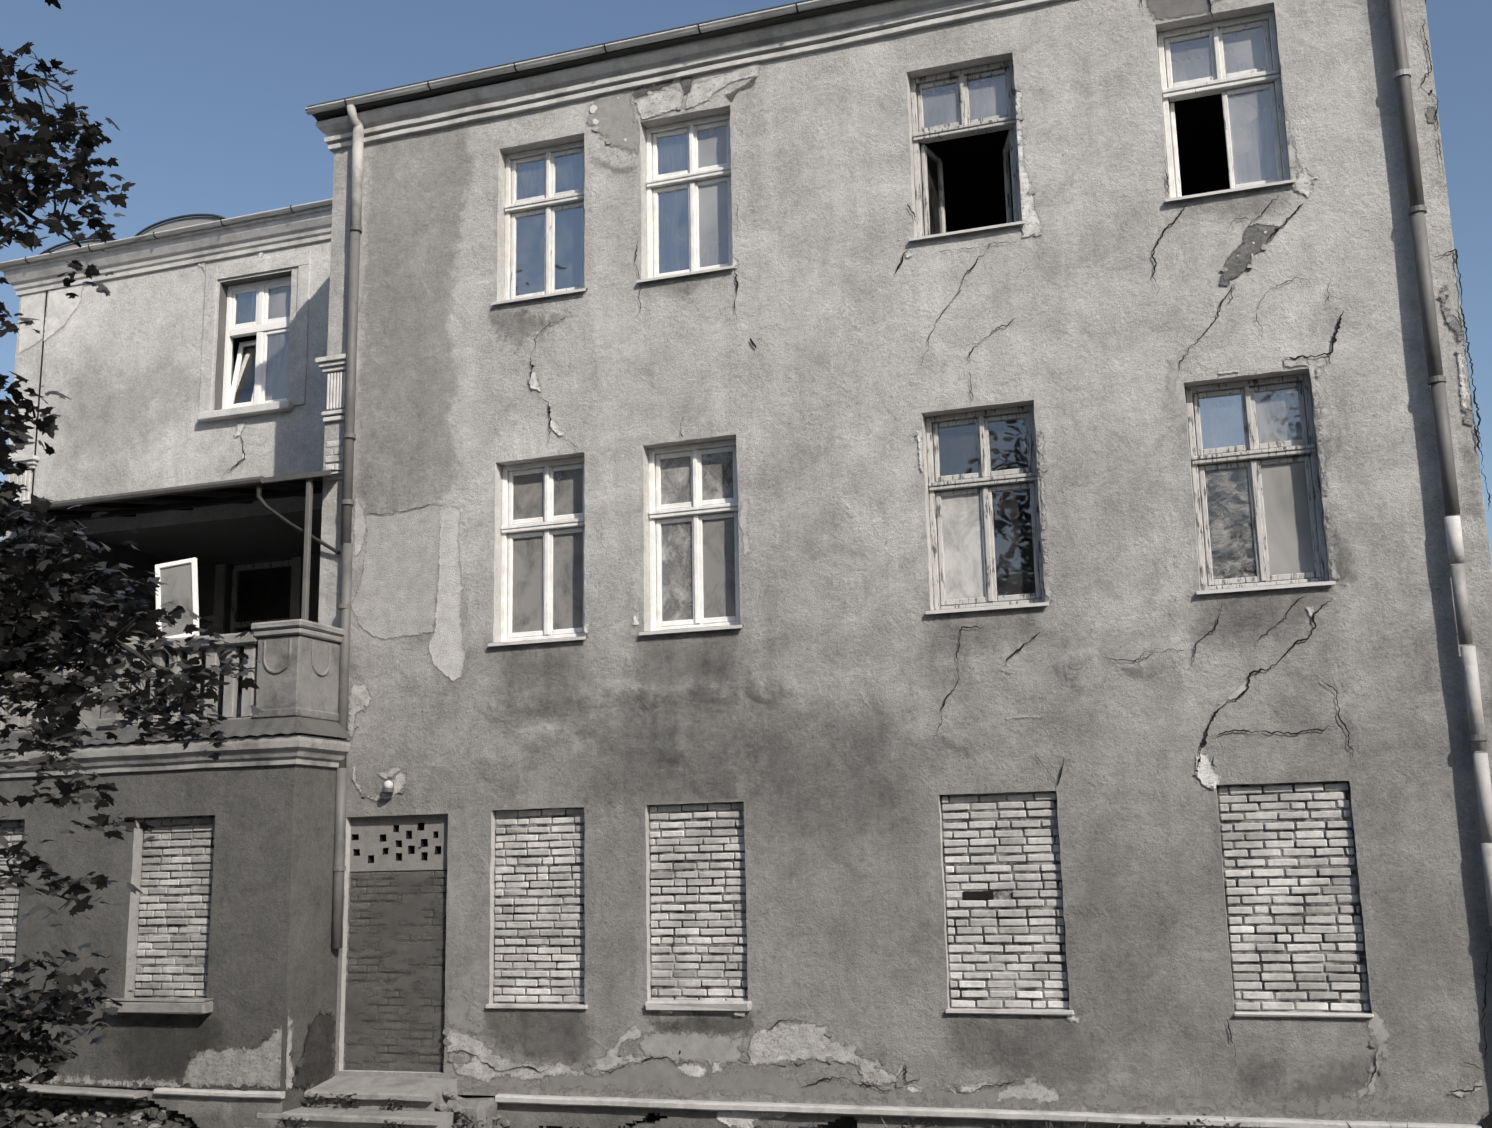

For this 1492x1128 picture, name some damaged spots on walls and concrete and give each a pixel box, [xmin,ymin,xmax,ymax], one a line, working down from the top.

crack [529,318,584,453]
peeling [586,62,761,154]
crack [895,204,1029,363]
spalling [1015,85,1044,238]
crack [1151,162,1187,294]
spalling [1219,223,1279,286]
crack [1179,277,1344,370]
crack [1435,249,1491,511]
crack [1006,632,1040,660]
crack [1196,597,1356,771]
spalling [0,1008,336,1091]
peeling [443,985,1484,1128]